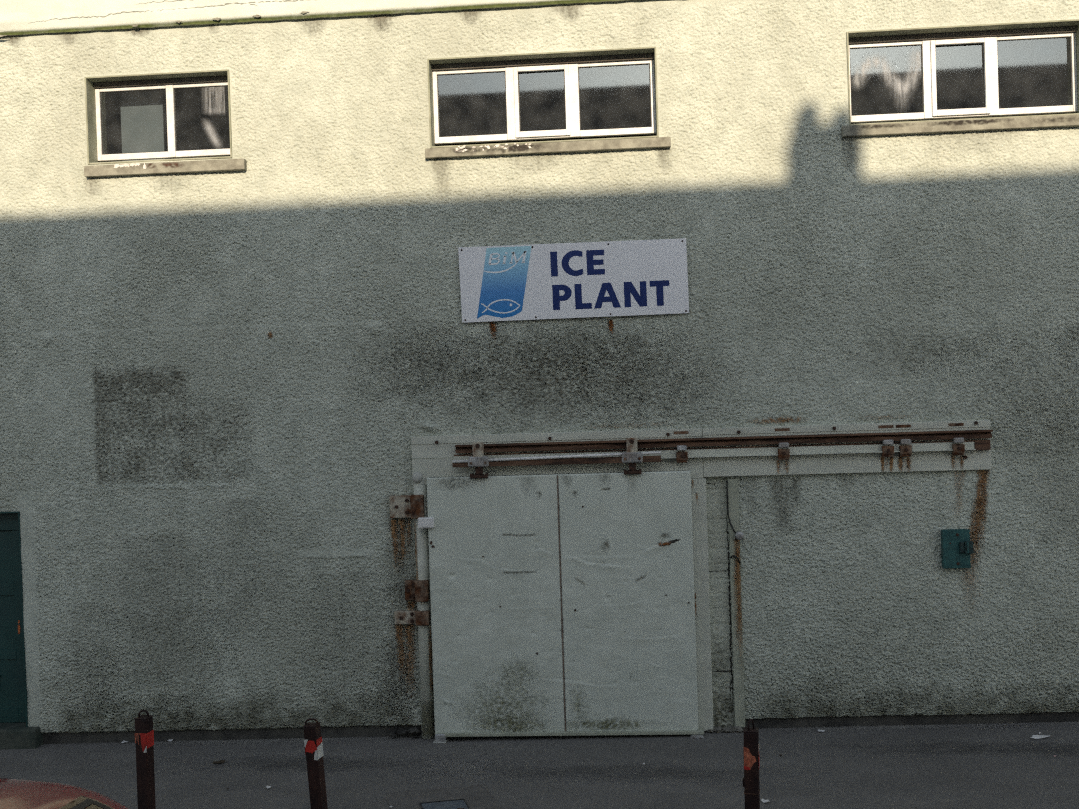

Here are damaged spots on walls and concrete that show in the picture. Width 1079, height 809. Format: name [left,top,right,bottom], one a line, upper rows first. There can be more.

water stain [94,372,182,479]
corrosion [971,470,988,563]